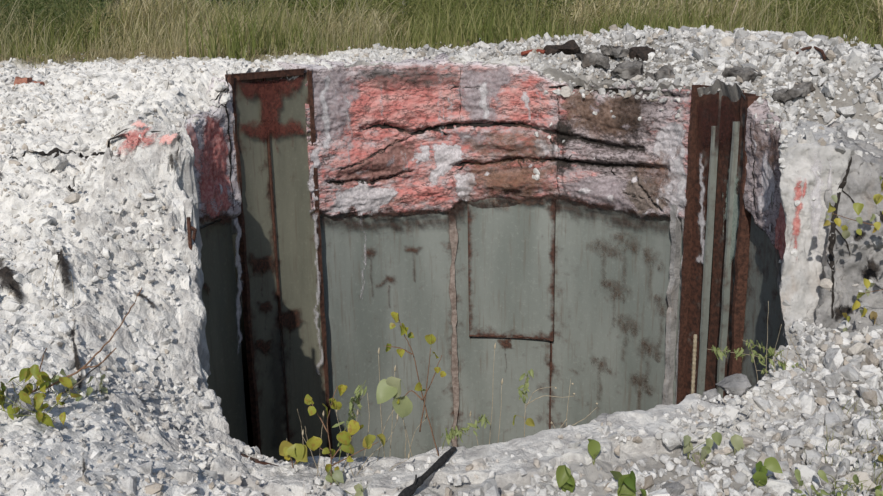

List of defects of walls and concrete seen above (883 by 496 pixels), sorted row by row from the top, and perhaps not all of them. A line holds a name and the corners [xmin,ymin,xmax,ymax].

peeling [119,115,232,219]
rust [240,78,304,139]
peeling [308,69,489,216]
peeling [457,66,511,122]
crack [327,72,680,202]
peeling [529,139,560,168]
spalling [562,89,640,135]
peeling [562,122,687,217]
rust [697,99,737,149]
peeling [753,140,807,260]
crack [827,157,855,318]